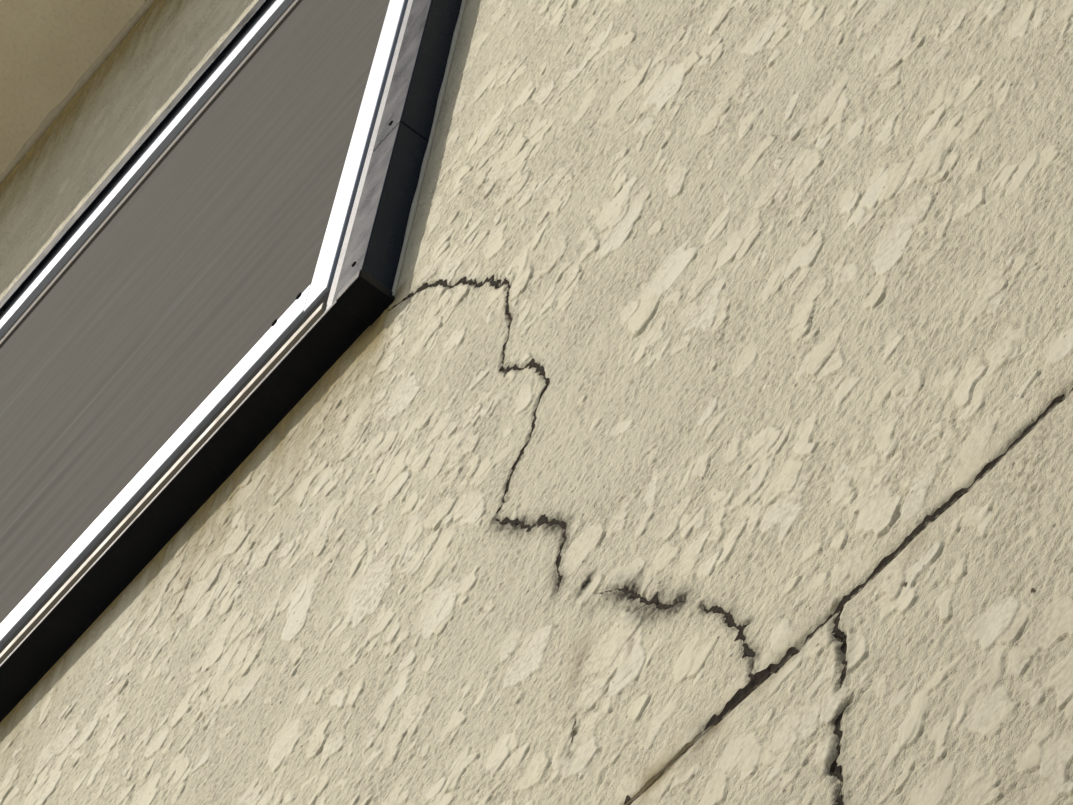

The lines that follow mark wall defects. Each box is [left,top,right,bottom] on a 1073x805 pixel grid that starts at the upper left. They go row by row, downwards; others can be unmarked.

crack [387,275,1073,805]